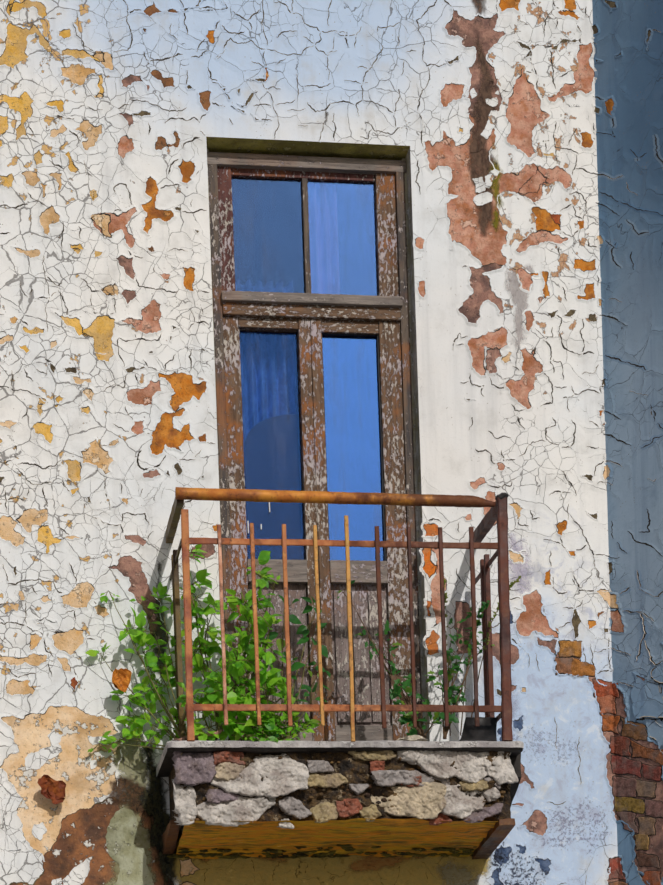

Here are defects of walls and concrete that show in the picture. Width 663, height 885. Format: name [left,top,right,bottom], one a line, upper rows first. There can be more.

leakage [472,0,485,14]
crack [0,221,118,335]
peeling [50,174,183,365]
leakage [469,41,501,236]
peeling [422,0,618,412]
crack [0,458,71,535]
crack [91,246,215,540]
peeling [123,365,209,482]
crack [460,94,663,727]
spalling [0,703,167,885]
leakage [109,743,177,885]
flaking render [488,559,663,885]